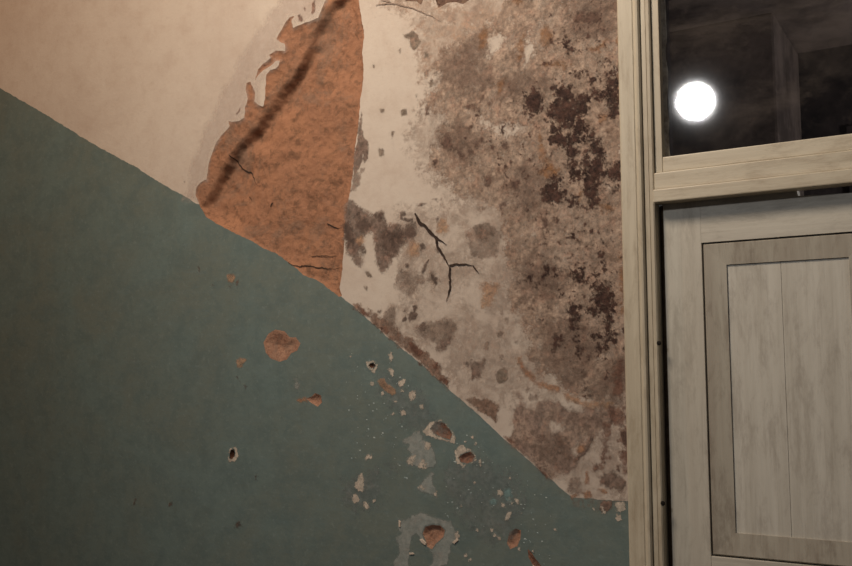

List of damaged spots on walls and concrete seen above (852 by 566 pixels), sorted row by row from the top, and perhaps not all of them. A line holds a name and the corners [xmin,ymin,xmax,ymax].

flaking render [436,0,469,8]
leakage [404,31,420,50]
flaking render [196,0,364,297]
leakage [343,114,437,295]
crack [414,213,479,301]
leakage [420,0,626,479]
peeling [263,330,301,362]
leakage [383,305,455,350]
peeling [403,420,481,496]
leakage [600,472,626,494]
peeling [393,513,460,566]
peeling [490,528,541,566]